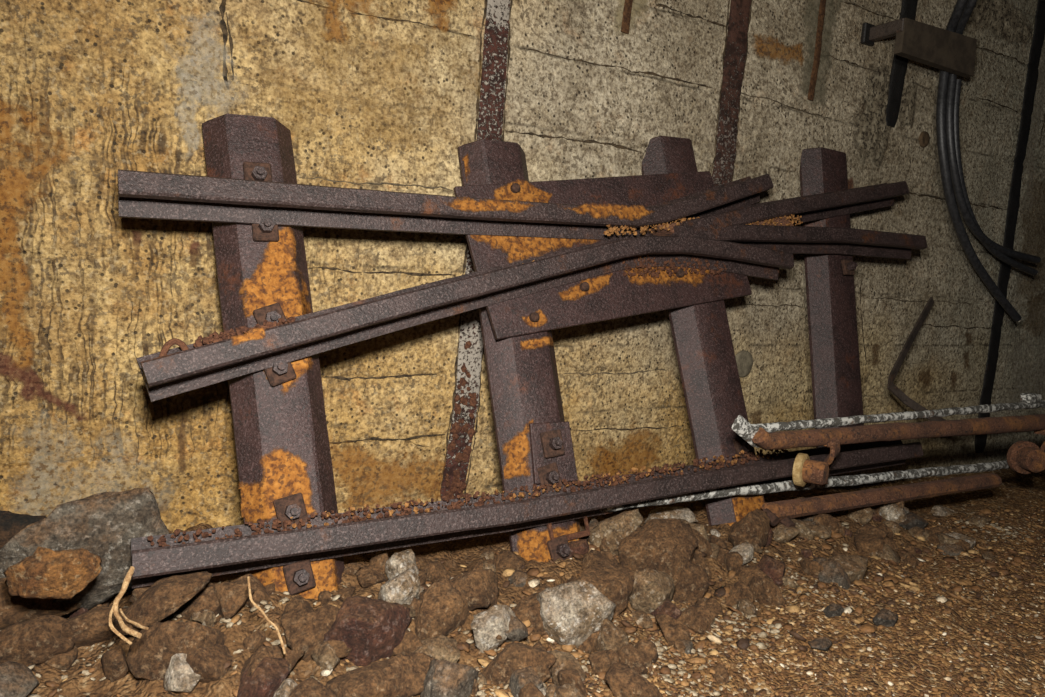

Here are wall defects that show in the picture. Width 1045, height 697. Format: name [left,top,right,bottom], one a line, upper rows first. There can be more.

crack [219,0,234,89]
corrosion [323,0,371,42]
corrosion [429,0,454,31]
corrosion [756,0,826,101]
corrosion [0,100,87,421]